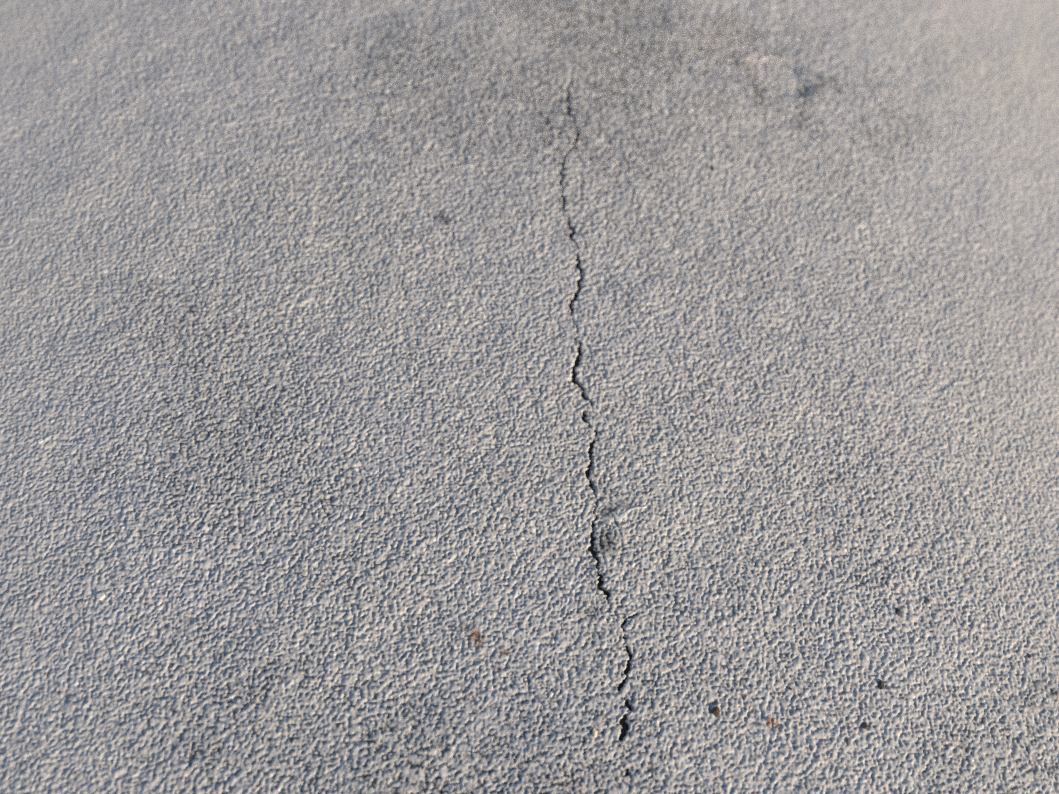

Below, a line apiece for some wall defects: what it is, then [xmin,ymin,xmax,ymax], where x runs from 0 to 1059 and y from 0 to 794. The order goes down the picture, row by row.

crack [559,84,632,777]